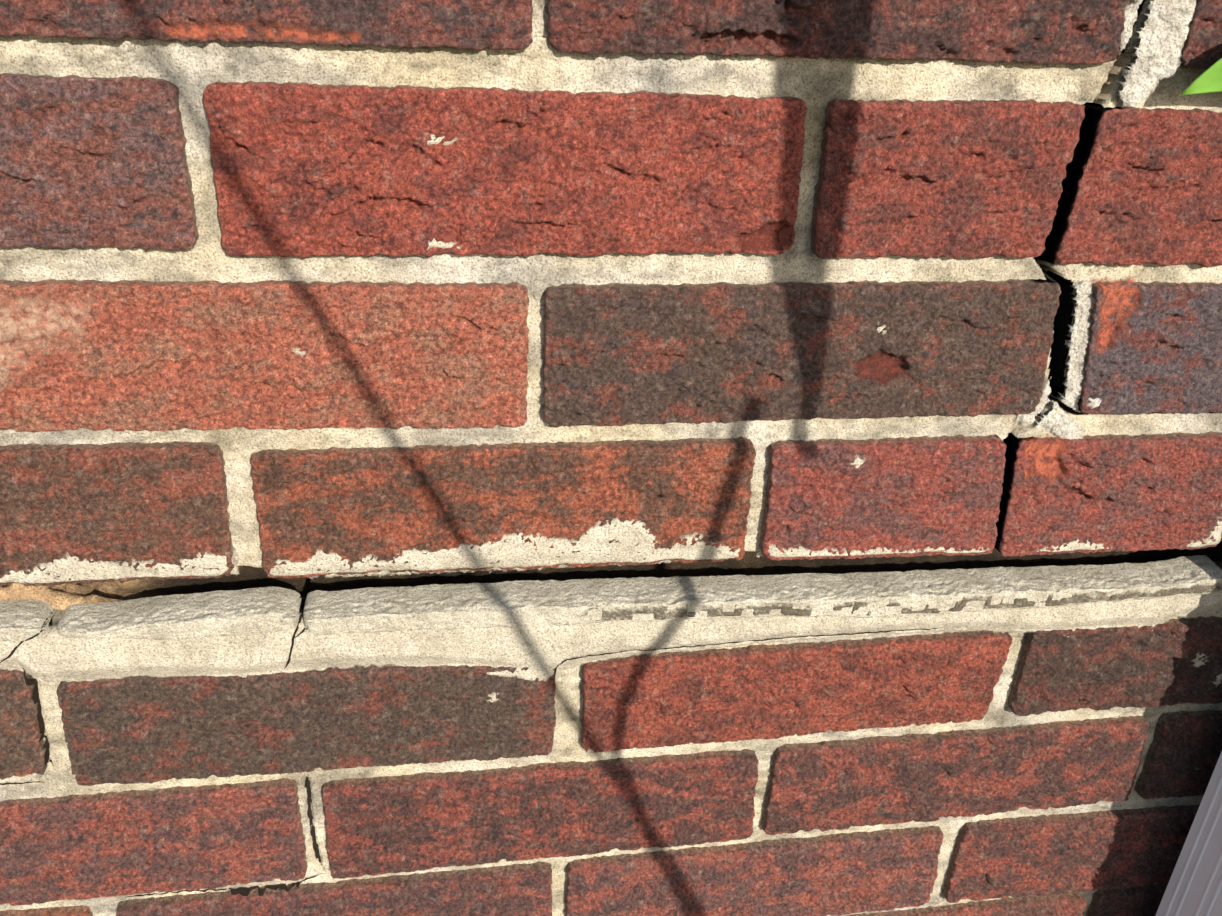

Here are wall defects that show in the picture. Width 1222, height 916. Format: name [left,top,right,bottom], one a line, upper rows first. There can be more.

crack [1119,0,1145,54]
crack [1033,258,1088,419]
crack [0,541,1222,785]